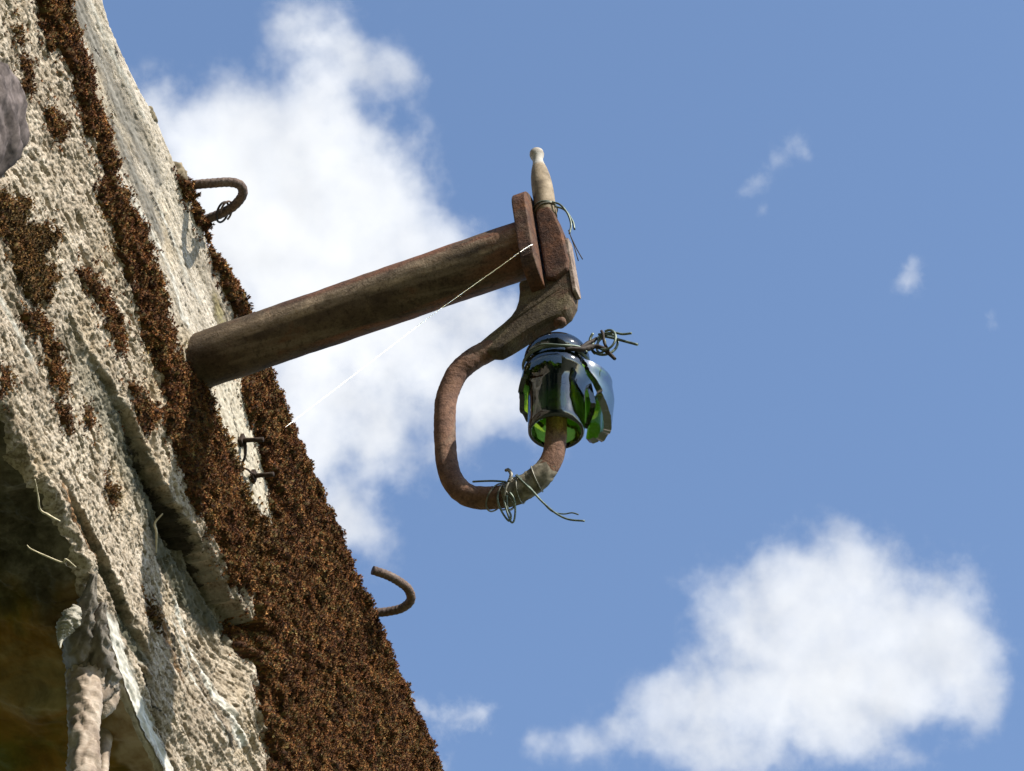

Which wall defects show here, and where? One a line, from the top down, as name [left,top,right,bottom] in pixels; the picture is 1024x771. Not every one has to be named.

spalling [97,565,146,661]